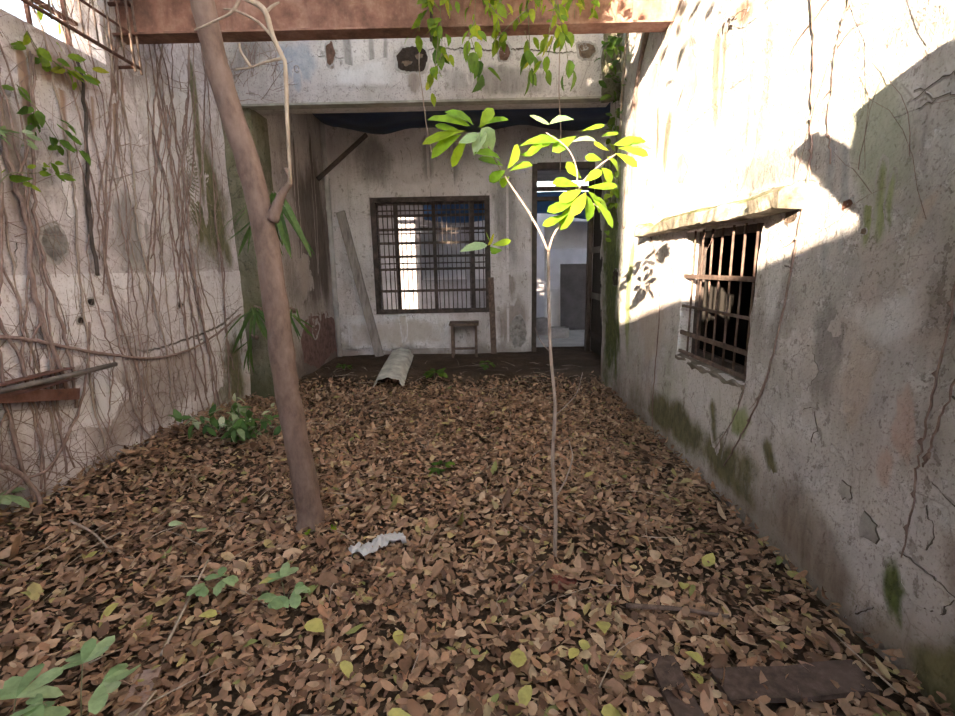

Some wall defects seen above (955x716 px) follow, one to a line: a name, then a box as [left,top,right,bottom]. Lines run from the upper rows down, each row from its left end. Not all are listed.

spalling [575,33,623,103]
crack [893,70,955,118]
leakage [624,226,861,623]
peeling [919,396,955,500]
peeling [858,510,880,544]